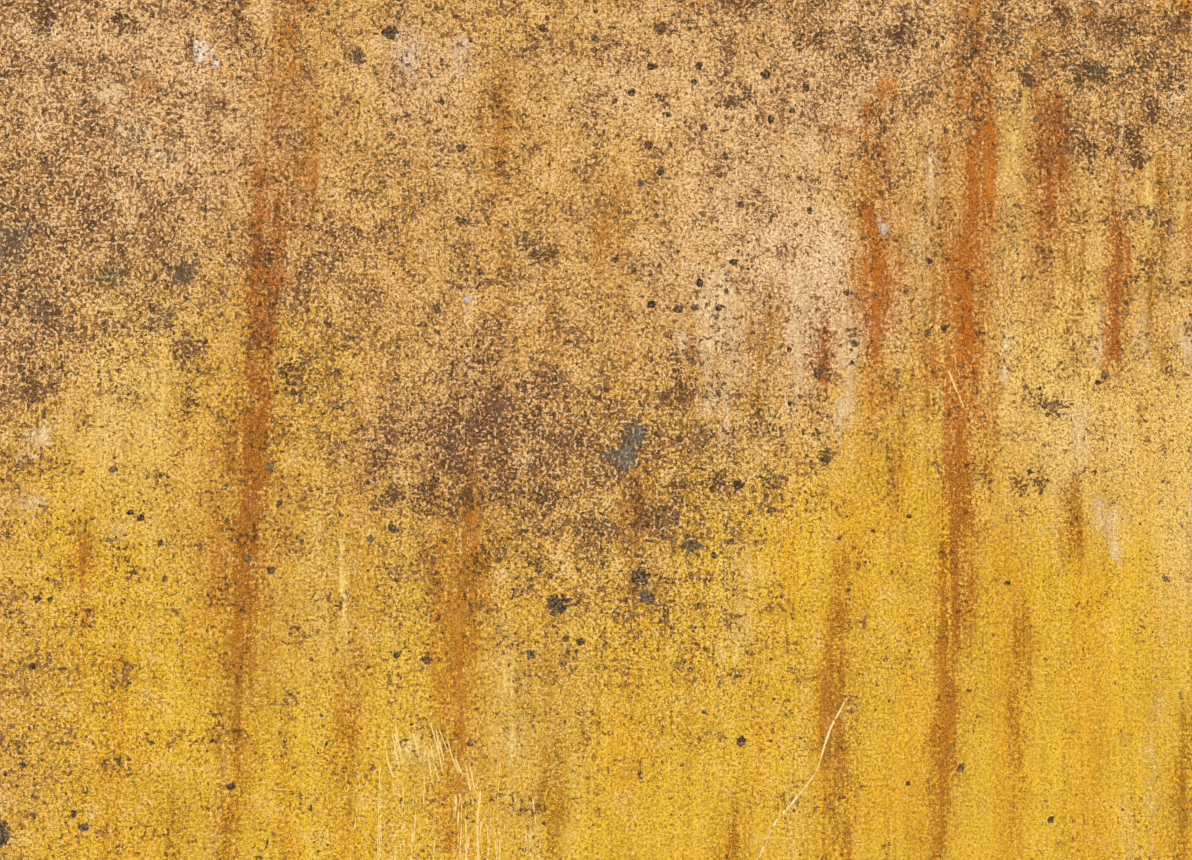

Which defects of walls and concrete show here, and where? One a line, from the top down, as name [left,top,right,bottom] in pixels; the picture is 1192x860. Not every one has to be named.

mould [29,2,57,41]
mould [111,5,147,38]
mould [215,0,252,23]
mould [711,0,787,22]
rust [1031,79,1085,330]
rust [1102,186,1132,387]
rust [210,80,293,856]
mould [341,342,647,540]
mould [630,466,739,538]
mould [755,464,789,493]
rust [817,58,997,860]
mould [507,546,553,579]